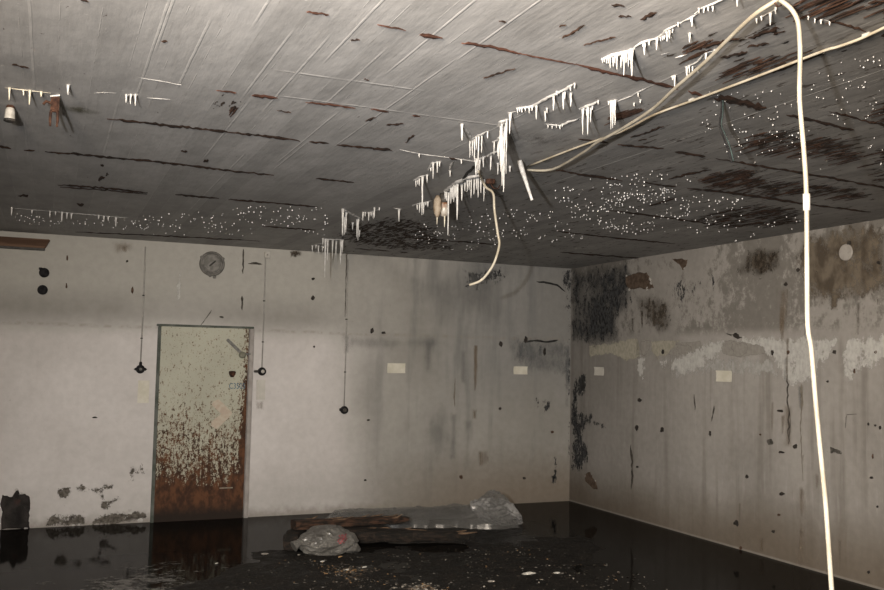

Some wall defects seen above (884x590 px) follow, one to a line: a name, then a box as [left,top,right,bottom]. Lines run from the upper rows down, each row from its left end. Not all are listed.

water stain [601,0,723,87]
water stain [398,83,648,230]
water stain [11,207,124,227]
water stain [562,260,696,347]
flaking render [625,272,654,291]
water stain [797,225,884,310]
peeling [659,331,884,387]
water stain [557,347,606,472]
flaking render [46,484,149,526]